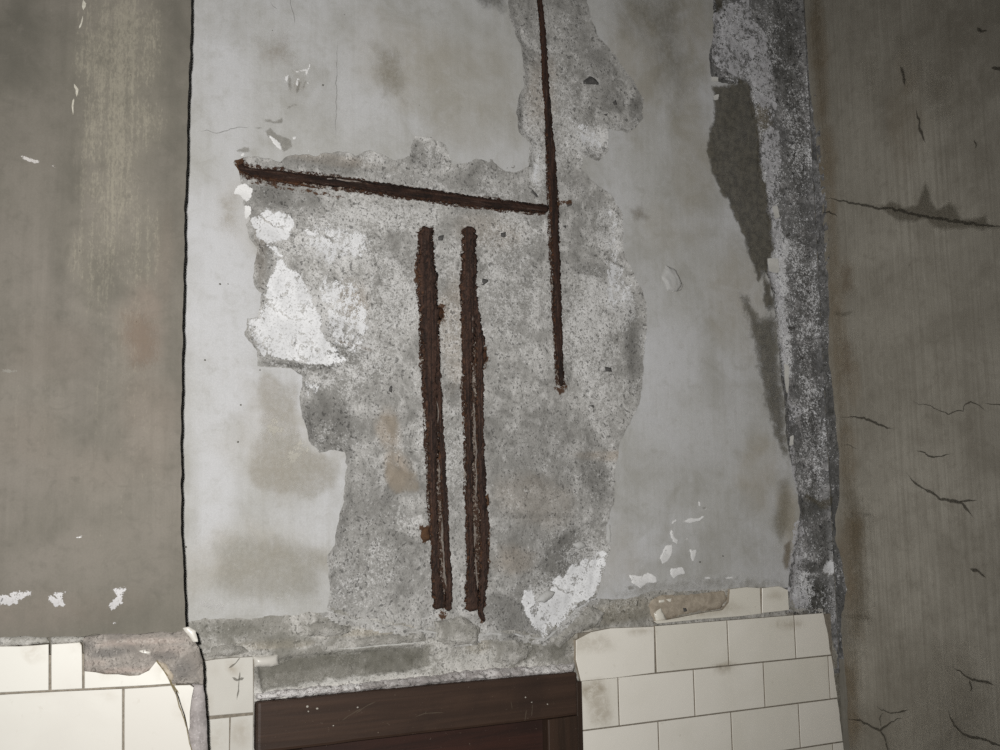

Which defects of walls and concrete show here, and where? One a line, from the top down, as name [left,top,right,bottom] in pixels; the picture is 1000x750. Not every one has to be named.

corrosion [234,0,572,395]
water stain [707,0,803,493]
crack [823,198,999,227]
spalling [83,0,847,750]
corrosion [413,226,491,624]
crack [909,476,976,514]
water stain [785,520,809,611]
crack [955,669,995,691]
crack [850,710,907,750]
crack [949,713,1000,746]